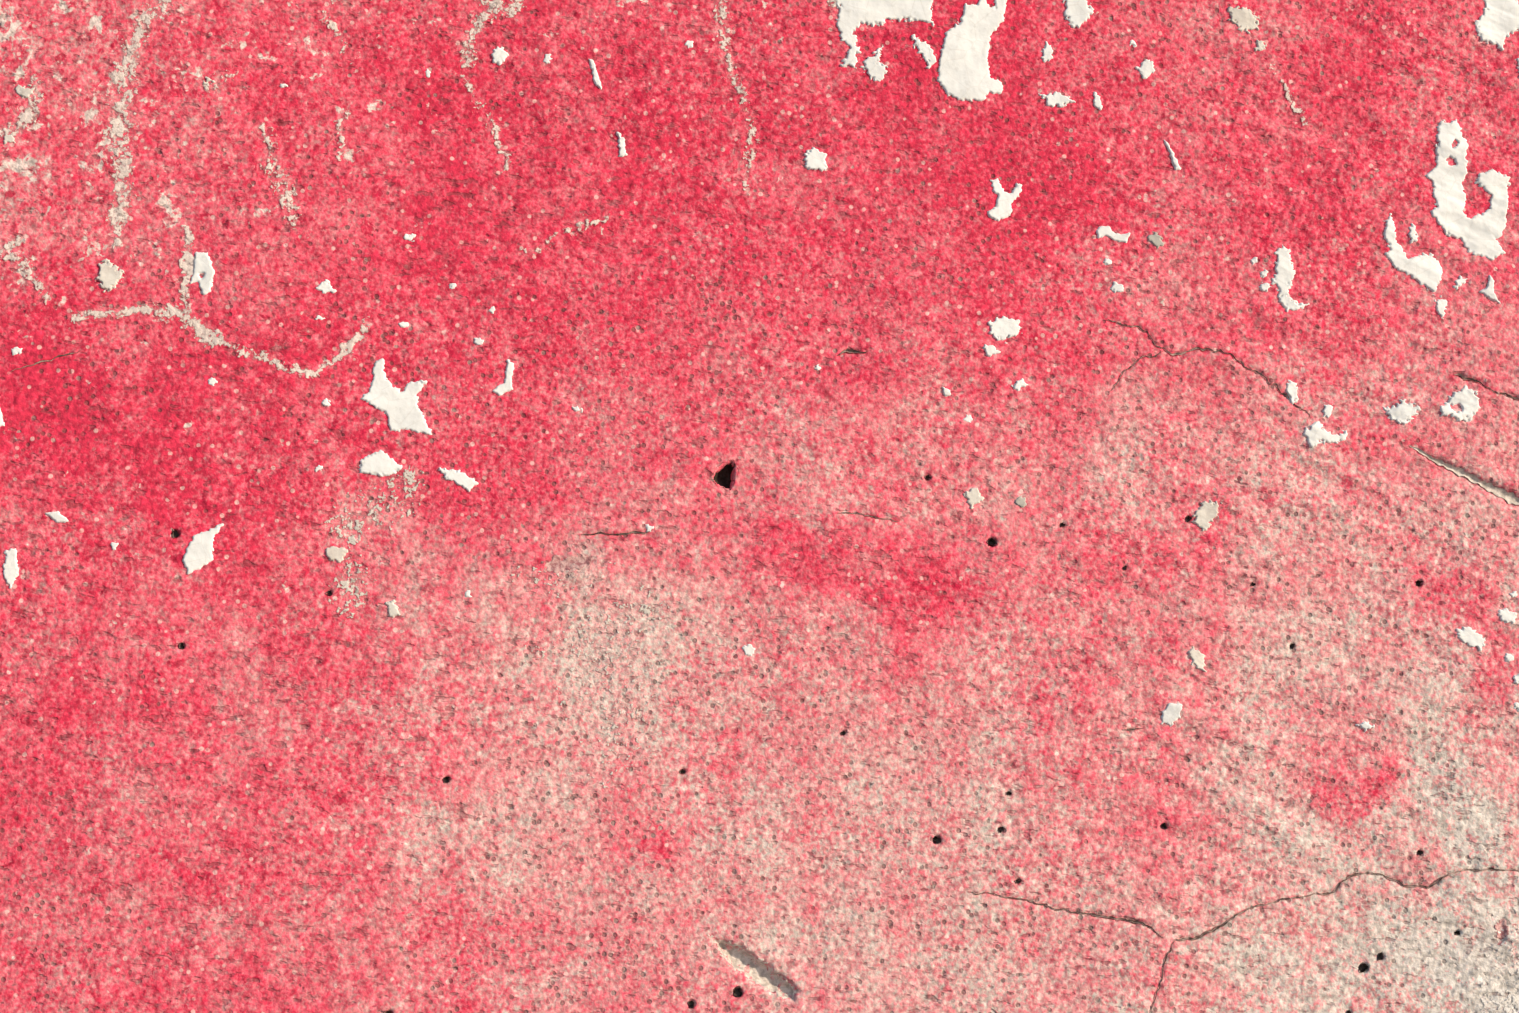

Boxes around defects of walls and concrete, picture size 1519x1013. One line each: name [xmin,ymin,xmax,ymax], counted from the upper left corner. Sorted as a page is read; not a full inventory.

peeling [835,0,1007,102]
peeling [1038,91,1103,111]
peeling [1063,0,1094,28]
peeling [1135,59,1155,79]
peeling [1383,119,1511,319]
peeling [1259,244,1310,312]
peeling [360,358,432,435]
crack [1108,319,1311,419]
crack [1453,373,1519,400]
peeling [182,523,224,574]
peeling [324,450,479,619]
crack [968,867,1519,1012]